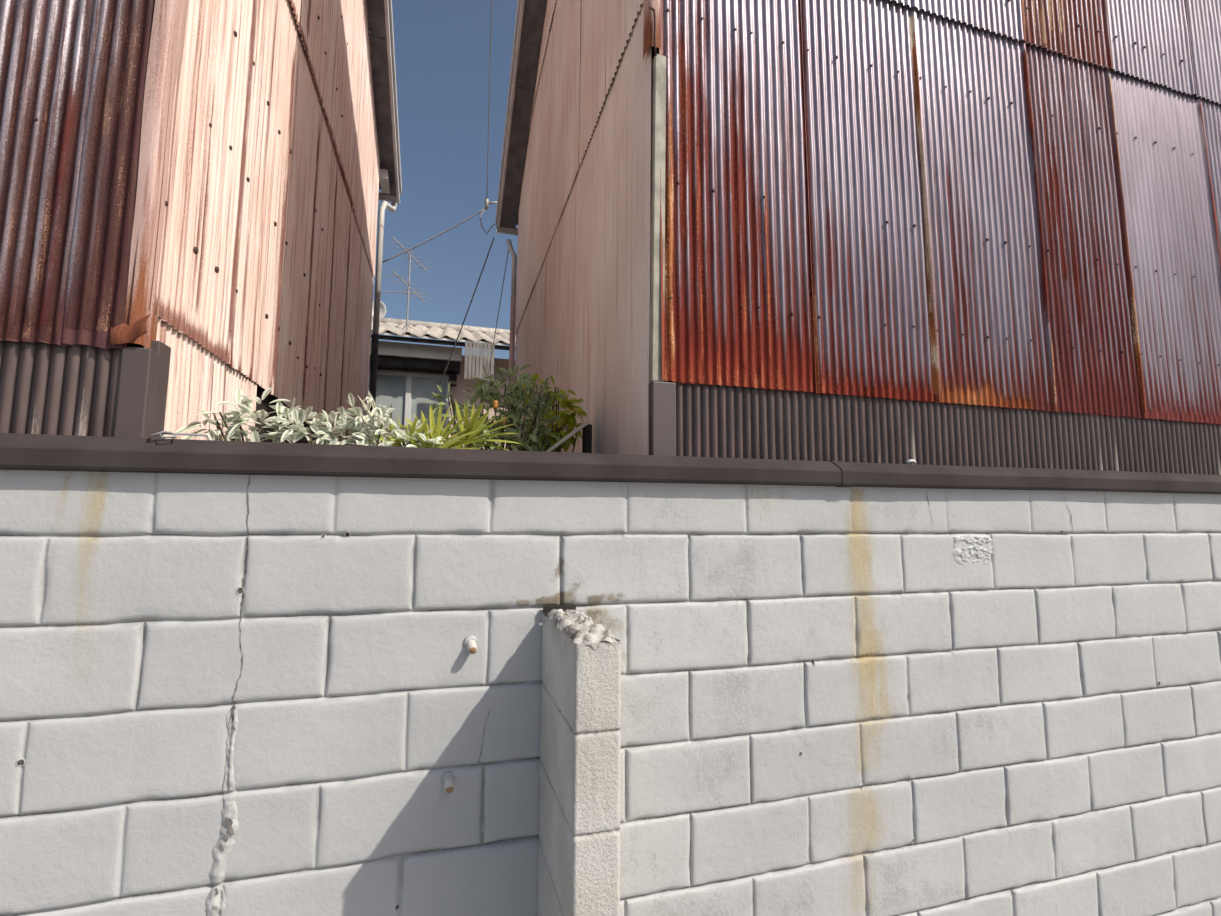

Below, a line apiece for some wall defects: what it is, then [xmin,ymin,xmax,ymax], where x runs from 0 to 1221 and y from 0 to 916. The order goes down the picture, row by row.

rust [0,0,155,341]
rust [665,0,1034,410]
rust [1021,0,1221,424]
crack [226,475,250,729]
peeling [952,534,994,567]